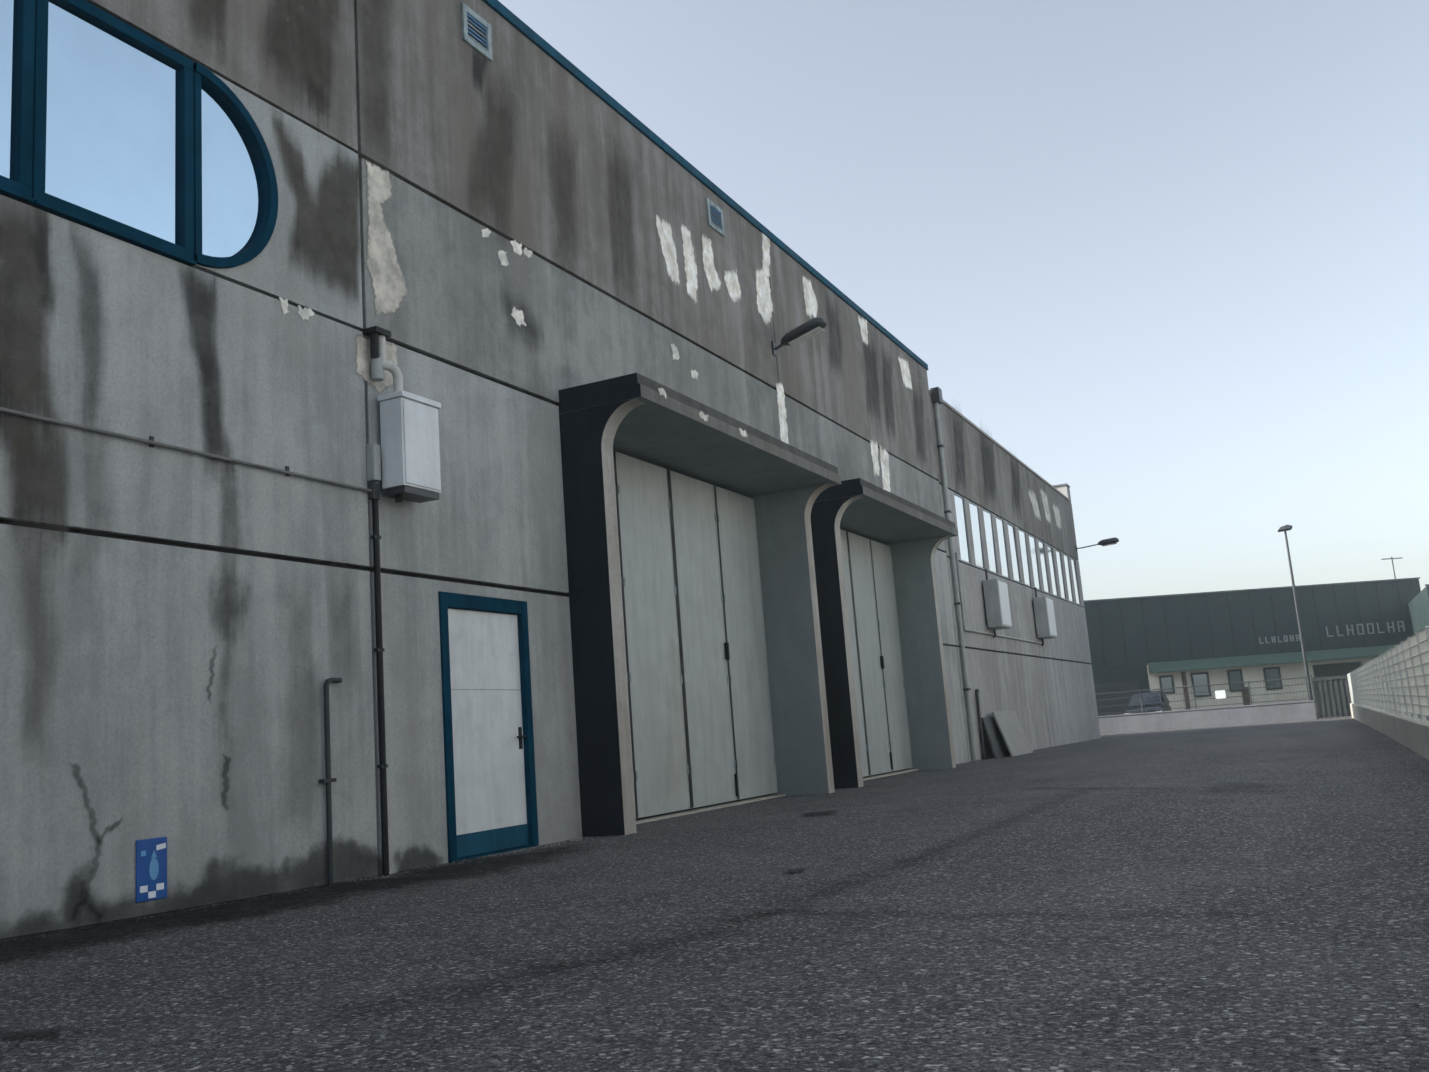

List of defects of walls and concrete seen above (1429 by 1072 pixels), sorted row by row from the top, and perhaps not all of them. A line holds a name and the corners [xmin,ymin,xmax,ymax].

water stain [268,0,337,104]
water stain [473,54,486,86]
water stain [276,123,360,293]
peeling [366,162,408,314]
peeling [498,240,533,266]
water stain [0,208,64,537]
water stain [185,271,229,462]
peeling [356,336,397,392]
spalling [511,307,526,326]